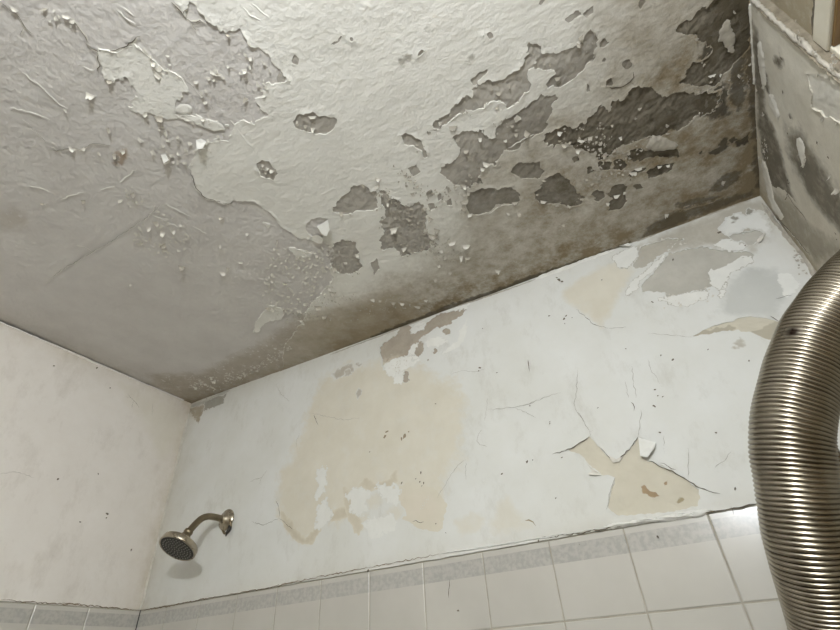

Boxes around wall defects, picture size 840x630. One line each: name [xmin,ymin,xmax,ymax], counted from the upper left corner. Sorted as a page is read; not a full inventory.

peeling [0,0,840,424]
damp [112,0,840,464]
damp [272,353,536,551]
crack [553,365,660,458]
peeling [561,437,712,529]
crack [649,450,750,514]